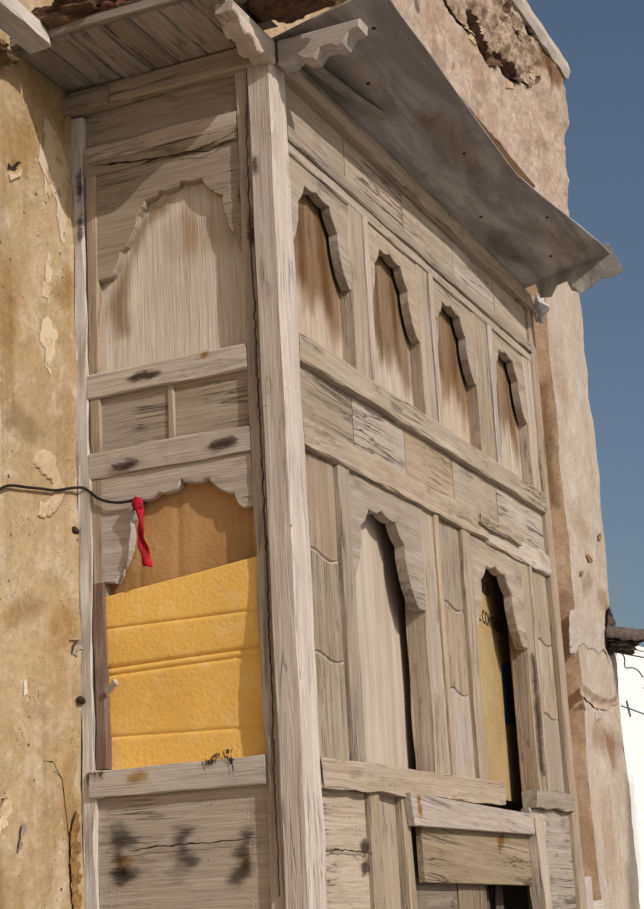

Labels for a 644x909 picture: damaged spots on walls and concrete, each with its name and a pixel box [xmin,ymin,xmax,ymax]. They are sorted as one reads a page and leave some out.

spalling [8,161,23,181]
peeling [35,118,84,243]
peeling [41,250,54,304]
peeling [40,316,58,374]
peeling [569,607,617,656]
spalling [579,684,619,720]
crack [49,761,73,909]
spalling [68,811,83,909]